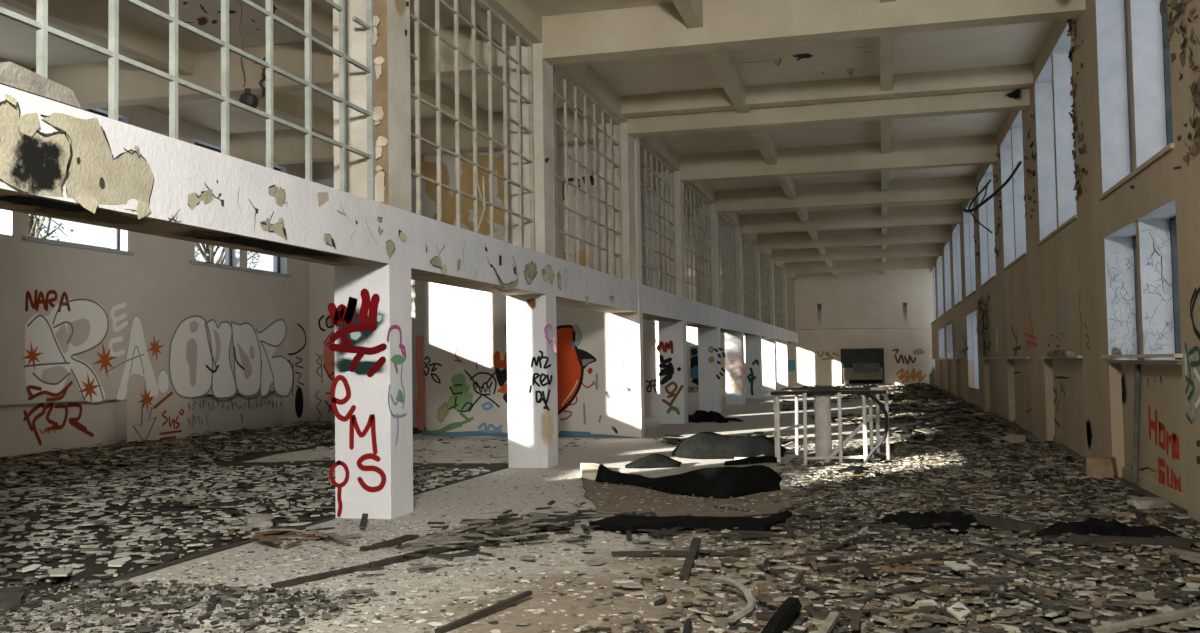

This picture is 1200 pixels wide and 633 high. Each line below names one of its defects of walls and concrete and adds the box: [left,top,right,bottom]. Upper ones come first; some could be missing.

peeling [0,94,154,219]
peeling [187,180,224,210]
peeling [255,185,287,240]
peeling [421,153,594,290]
peeling [1066,19,1088,201]
peeling [1159,0,1200,170]